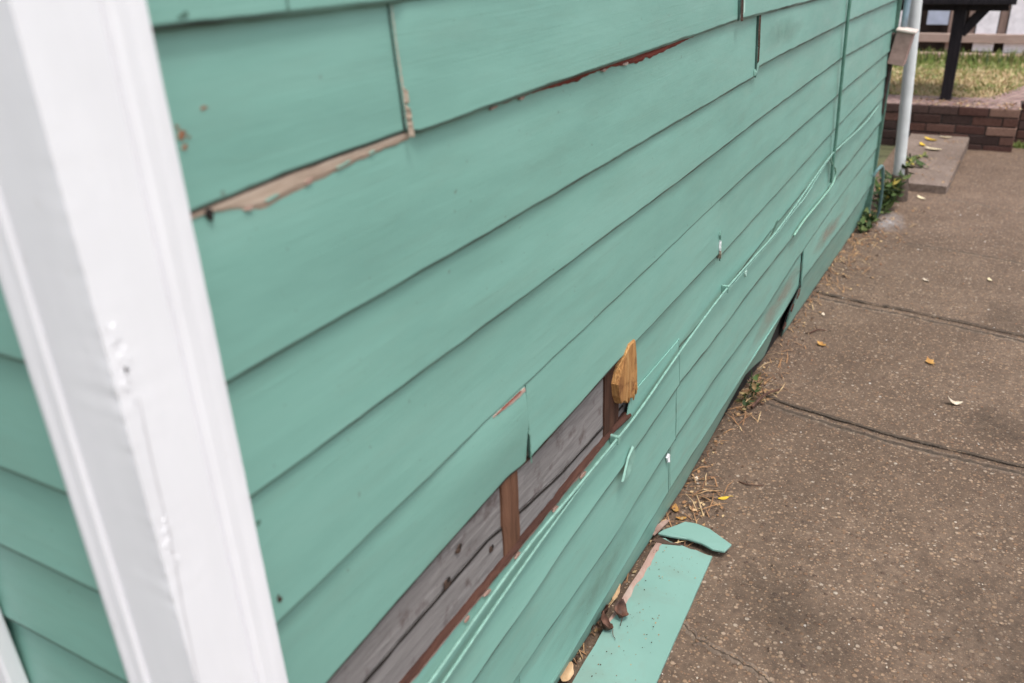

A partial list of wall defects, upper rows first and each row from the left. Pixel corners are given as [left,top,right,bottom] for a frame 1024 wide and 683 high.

peeling [489,36,694,110]
peeling [190,131,409,221]
peeling [493,387,526,418]
peeling [621,446,635,482]